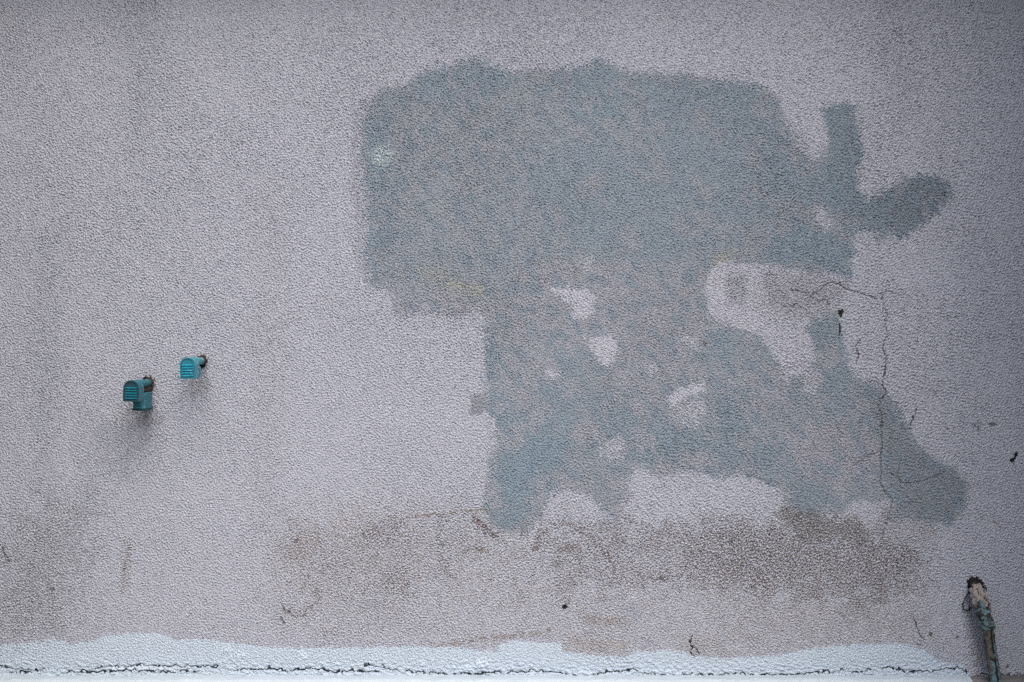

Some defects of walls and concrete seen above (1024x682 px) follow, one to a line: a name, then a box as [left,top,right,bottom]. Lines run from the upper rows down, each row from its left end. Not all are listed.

damp [861,0,936,153]
crack [776,282,945,538]